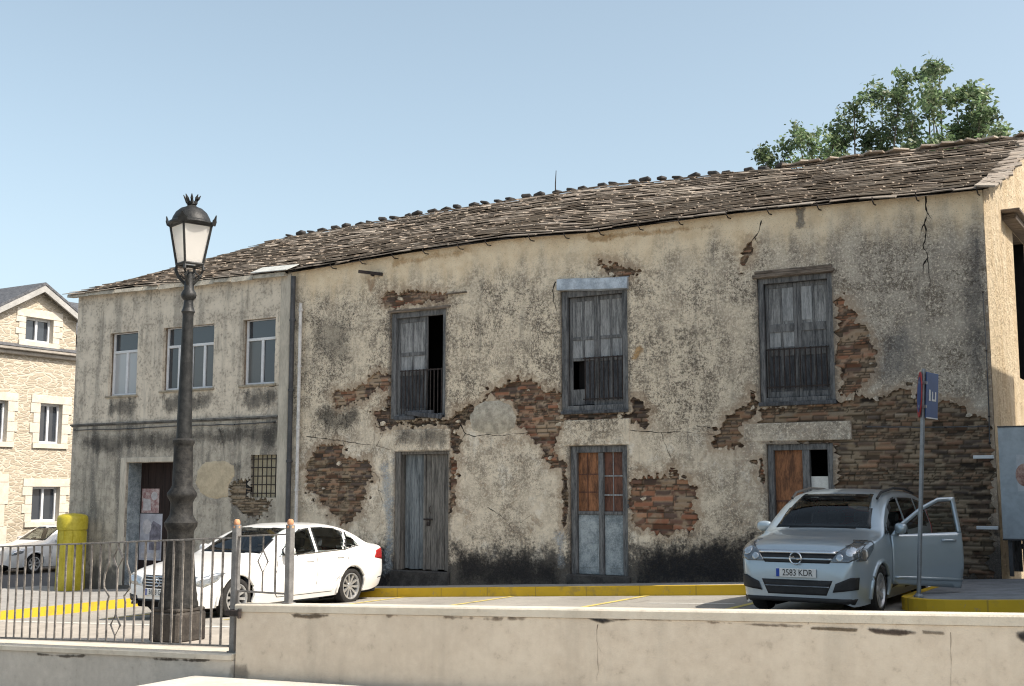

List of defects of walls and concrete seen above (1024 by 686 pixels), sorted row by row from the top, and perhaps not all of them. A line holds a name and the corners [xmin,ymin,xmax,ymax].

flaking render [597,261,642,277]
flaking render [738,242,754,274]
crack [919,196,931,278]
flaking render [383,290,448,310]
flaking render [333,366,651,527]
flaking render [712,293,997,579]
peeling [196,461,272,521]
flaking render [304,443,374,526]
flaking render [629,468,702,538]
leakage [459,552,556,585]
leakage [637,533,752,583]